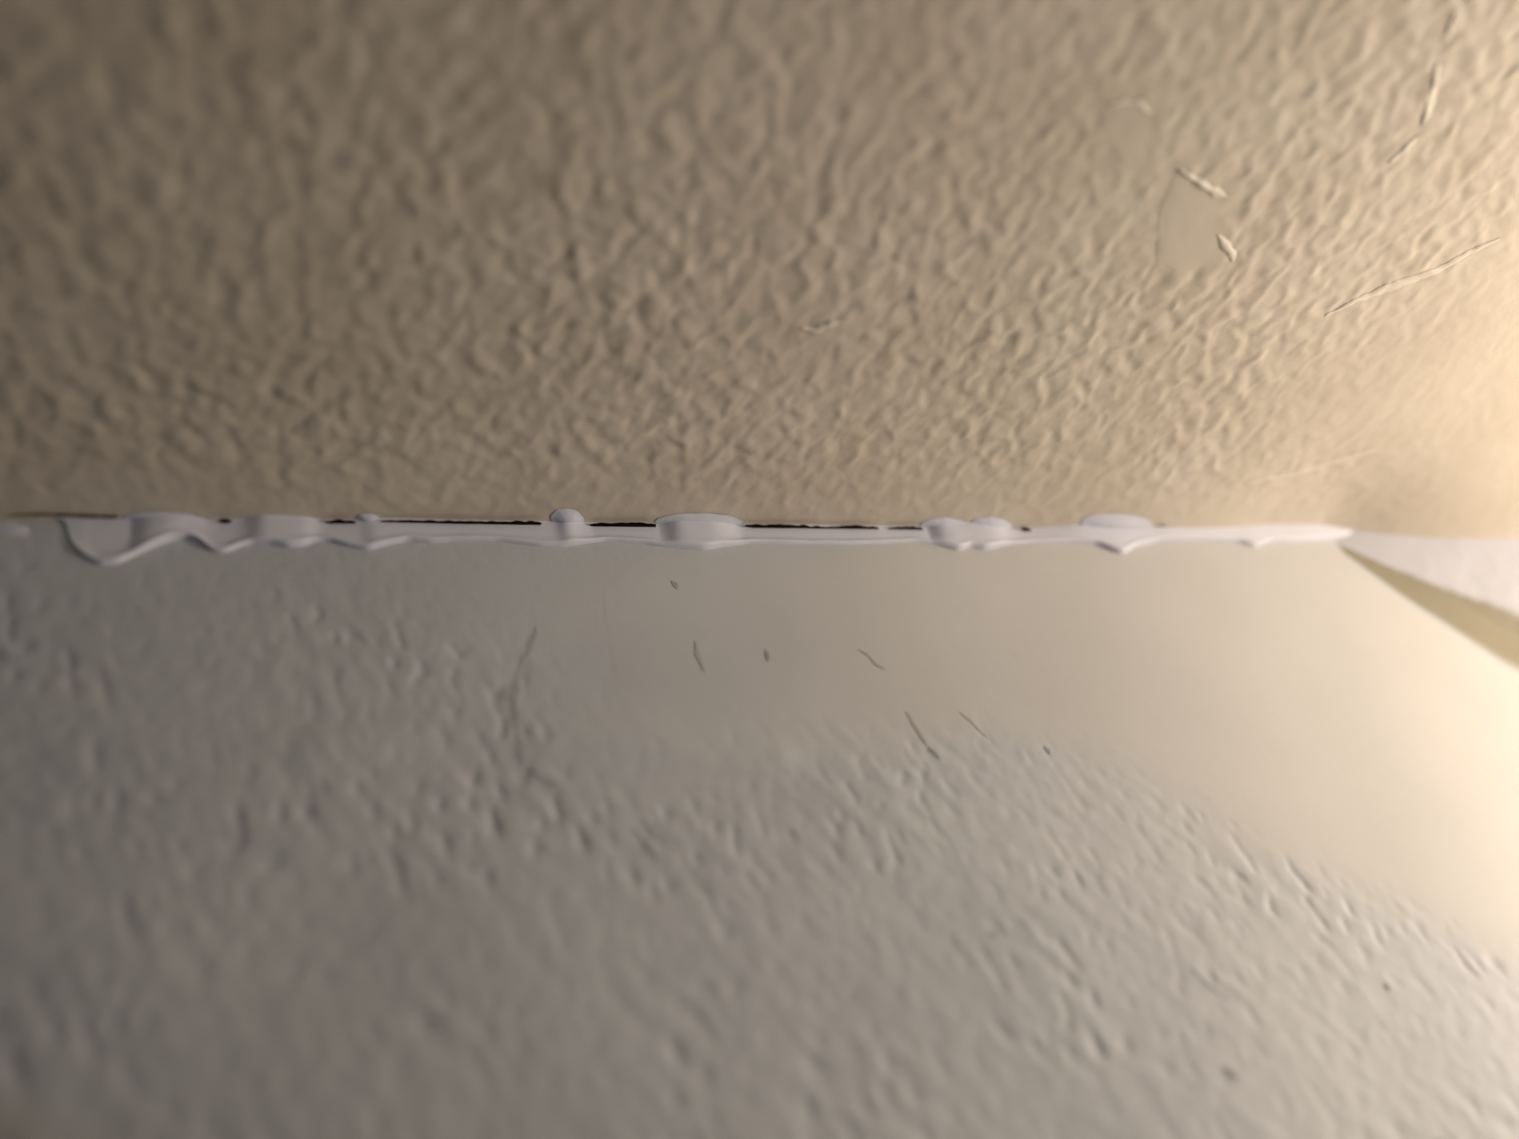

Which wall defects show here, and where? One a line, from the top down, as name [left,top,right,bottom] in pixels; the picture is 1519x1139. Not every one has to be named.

crack [8,512,120,520]
crack [325,518,542,526]
crack [590,520,656,528]
crack [745,523,923,531]